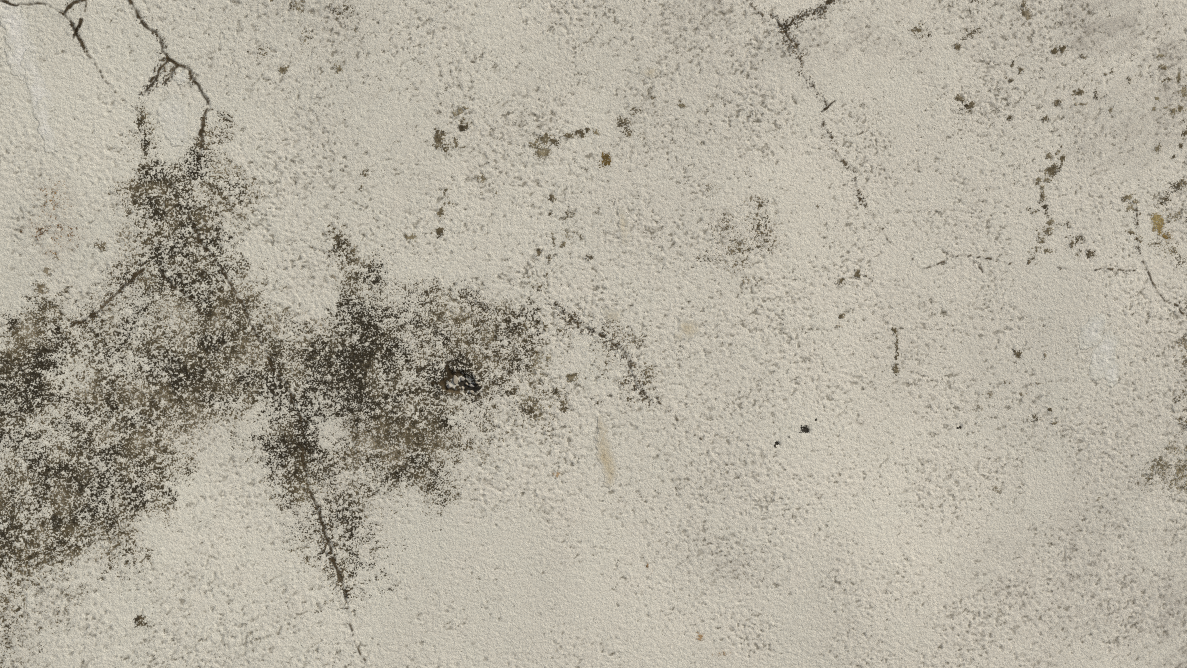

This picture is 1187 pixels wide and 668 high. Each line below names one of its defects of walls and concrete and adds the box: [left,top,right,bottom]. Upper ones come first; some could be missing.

crack [1,0,213,161]
crack [67,263,208,333]
crack [188,212,366,661]
damp [0,70,618,668]
crack [747,0,1011,273]
crack [1095,208,1187,316]